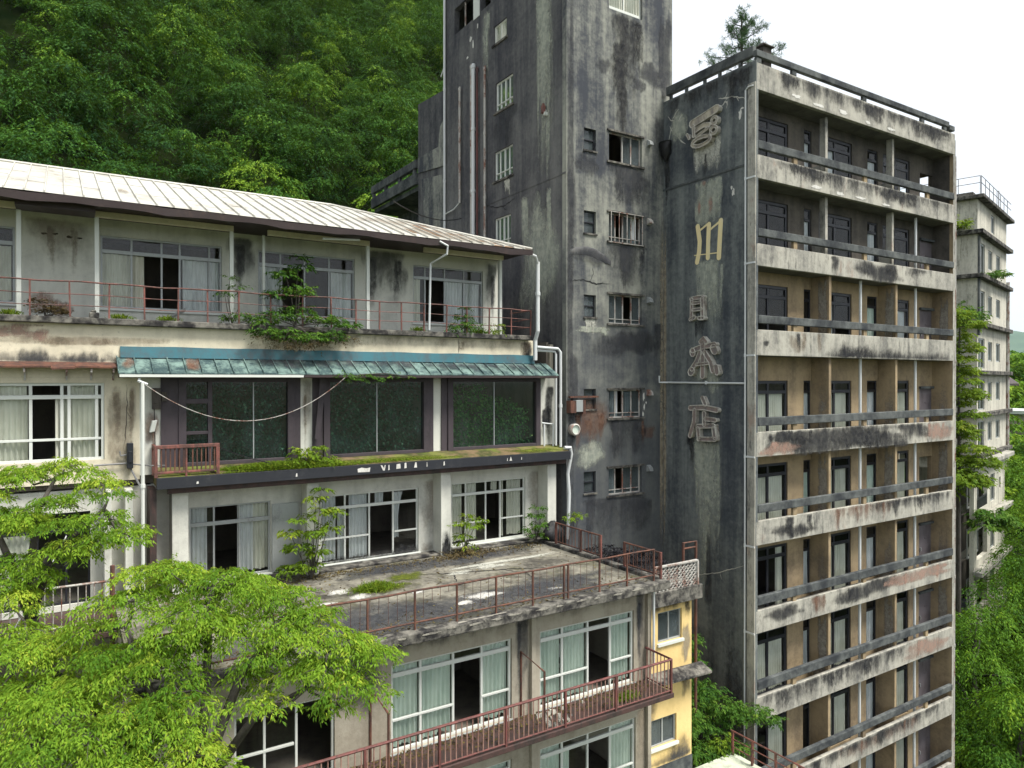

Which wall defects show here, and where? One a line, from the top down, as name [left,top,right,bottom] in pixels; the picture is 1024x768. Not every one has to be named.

damp [612,15,642,135]
damp [790,164,824,183]
damp [881,189,916,206]
damp [234,239,252,282]
damp [370,252,406,295]
damp [771,431,812,445]
damp [843,428,887,447]
damp [898,424,928,436]
damp [769,604,804,620]